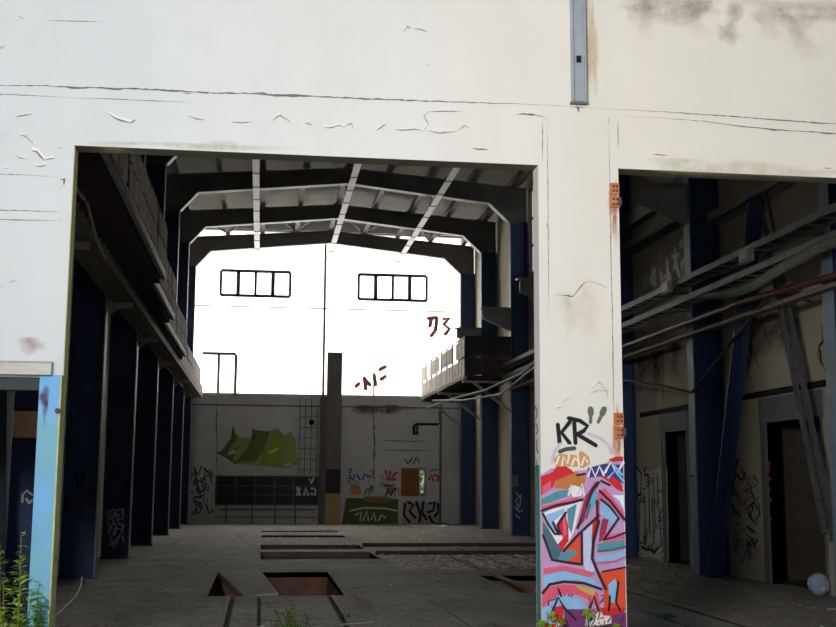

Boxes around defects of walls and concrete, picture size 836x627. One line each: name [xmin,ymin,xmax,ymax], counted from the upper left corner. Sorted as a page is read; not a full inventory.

peeling [14,133,63,167]
crack [0,85,556,183]
peeling [395,110,469,134]
crack [577,106,836,134]
crack [548,140,619,407]